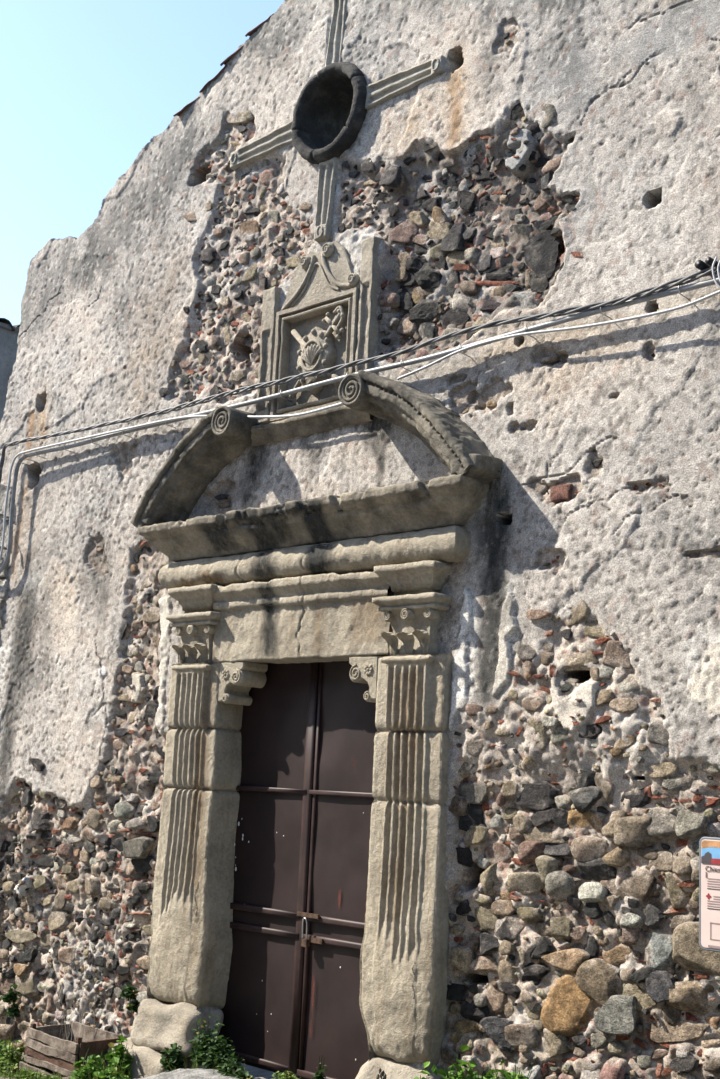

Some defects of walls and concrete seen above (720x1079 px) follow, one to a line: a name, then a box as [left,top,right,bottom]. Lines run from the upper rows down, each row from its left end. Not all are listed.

crack [580,0,695,126]
spalling [188,162,212,187]
spalling [530,346,569,368]
spalling [527,447,605,505]
spalling [84,531,109,577]
damp [203,500,332,654]
peeling [131,596,173,734]
peeling [449,586,473,729]
peeling [492,592,520,695]
peeling [550,662,601,730]
peeling [688,639,720,717]
peeling [14,874,38,897]